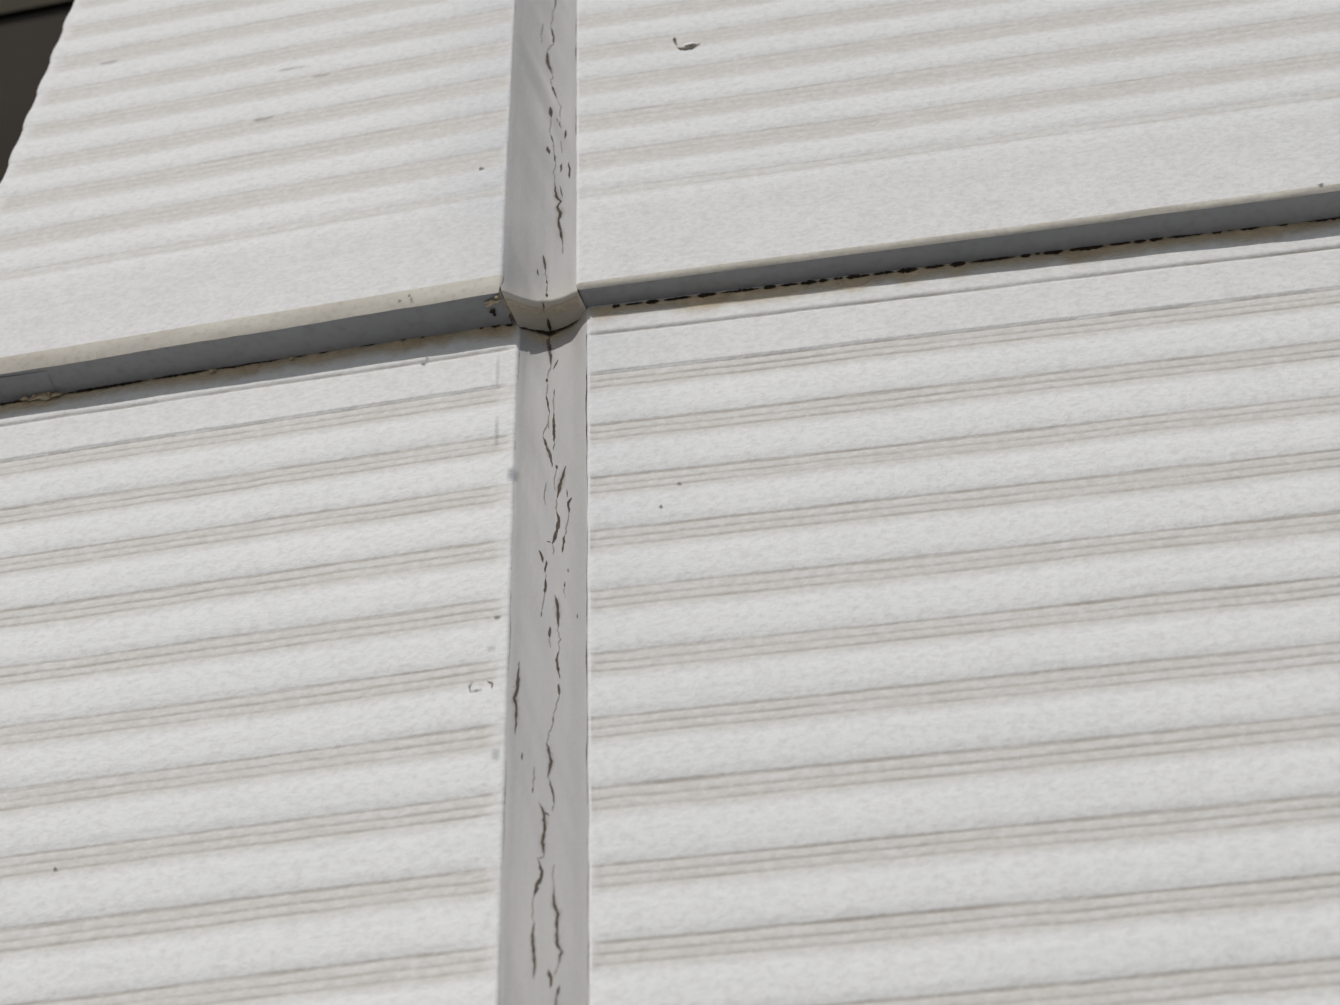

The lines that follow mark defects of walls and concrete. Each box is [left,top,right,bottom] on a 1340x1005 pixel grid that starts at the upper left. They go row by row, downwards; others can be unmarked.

crack [612,217,1340,308]
crack [64,351,328,394]
crack [480,0,580,1005]